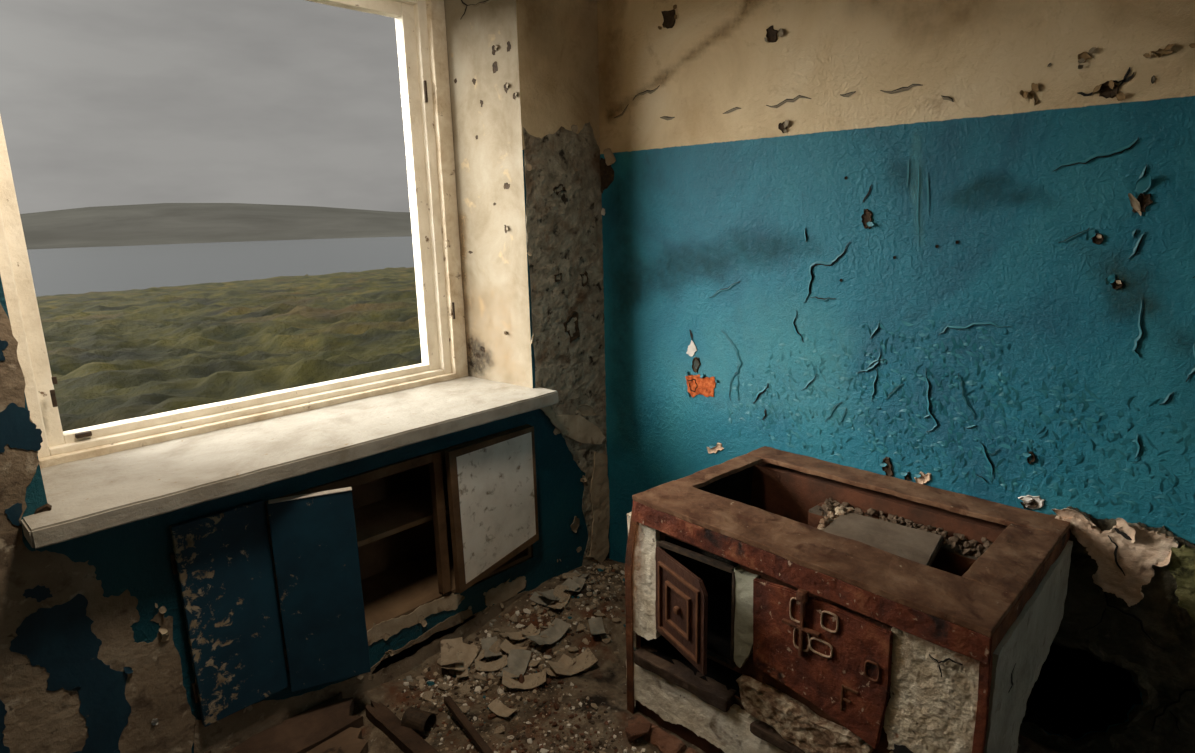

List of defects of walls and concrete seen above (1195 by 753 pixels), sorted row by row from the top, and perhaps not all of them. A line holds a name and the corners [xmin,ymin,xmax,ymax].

peeling [492,41,517,99]
spalling [1078,67,1135,101]
crack [1052,137,1147,178]
peeling [523,122,616,566]
flaking render [685,330,717,398]
crack [722,331,769,420]
crack [792,228,850,343]
crack [825,323,1000,483]
crack [1128,229,1146,259]
crack [1132,297,1144,359]
peeling [0,303,535,753]
spalling [1018,495,1195,753]